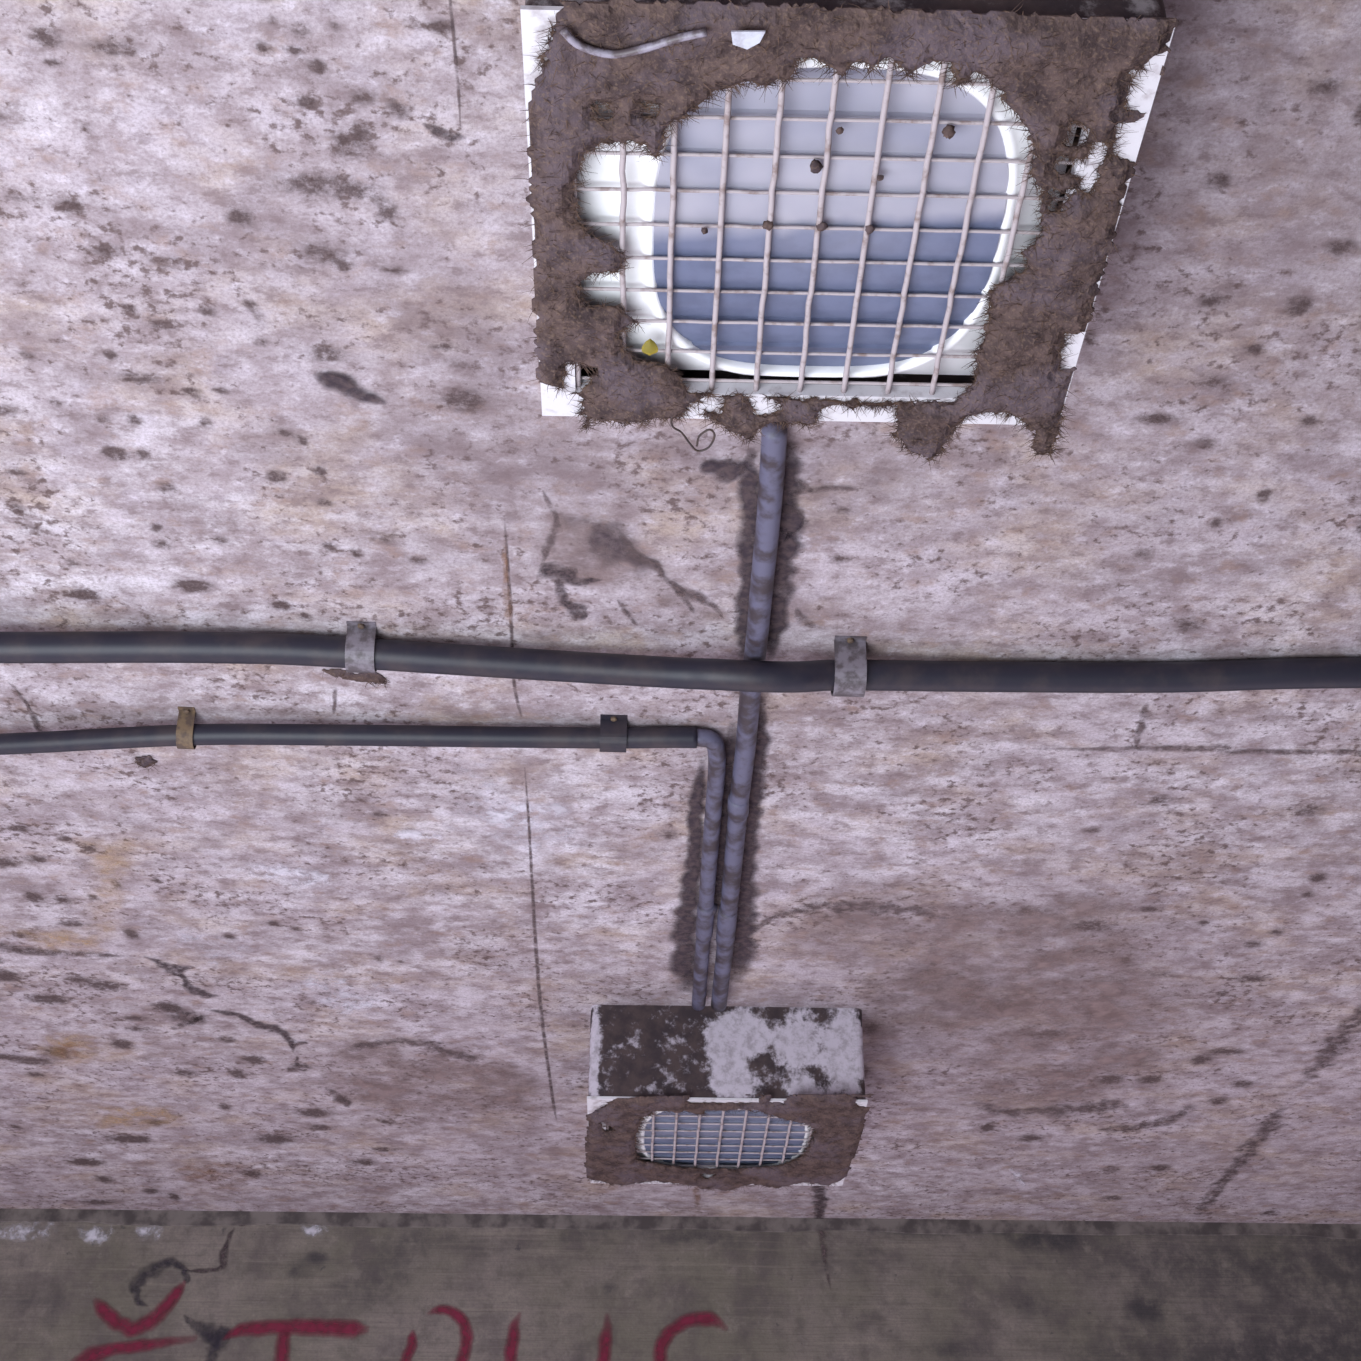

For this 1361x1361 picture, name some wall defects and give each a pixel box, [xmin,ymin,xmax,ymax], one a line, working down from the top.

crack [1086,707,1360,755]
crack [150,959,309,1072]
crack [1305,1009,1361,1077]
crack [1200,1114,1279,1208]